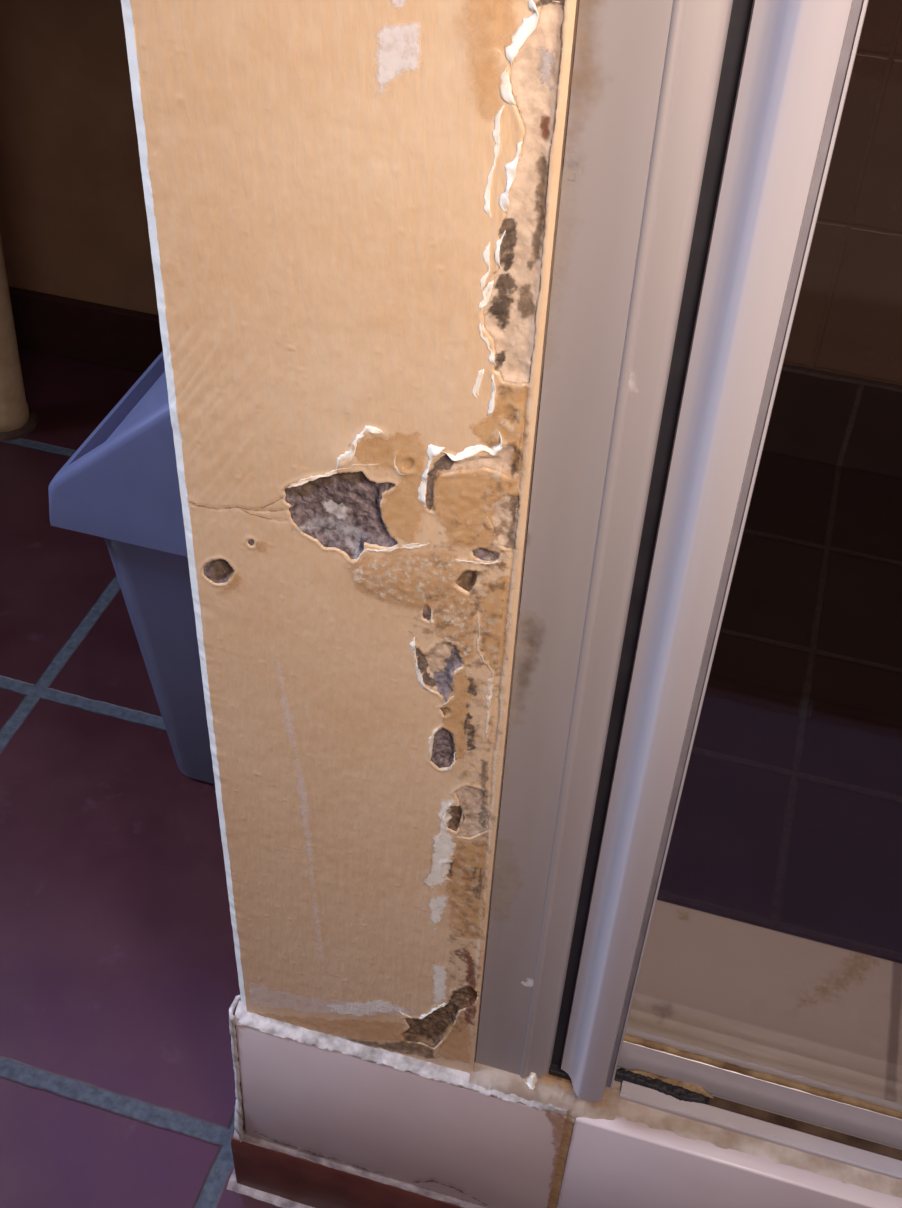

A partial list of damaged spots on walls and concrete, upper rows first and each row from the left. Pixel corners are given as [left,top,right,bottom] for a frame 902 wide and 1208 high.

peeling [472,0,565,419]
flaking render [204,559,234,583]
crack [197,502,275,519]
flaking render [285,426,429,563]
flaking render [423,604,434,623]
peeling [418,432,522,510]
peeling [455,494,519,592]
flaking render [409,637,464,771]
peeling [476,611,494,741]
peeling [424,761,488,930]
flaking render [399,987,478,1048]